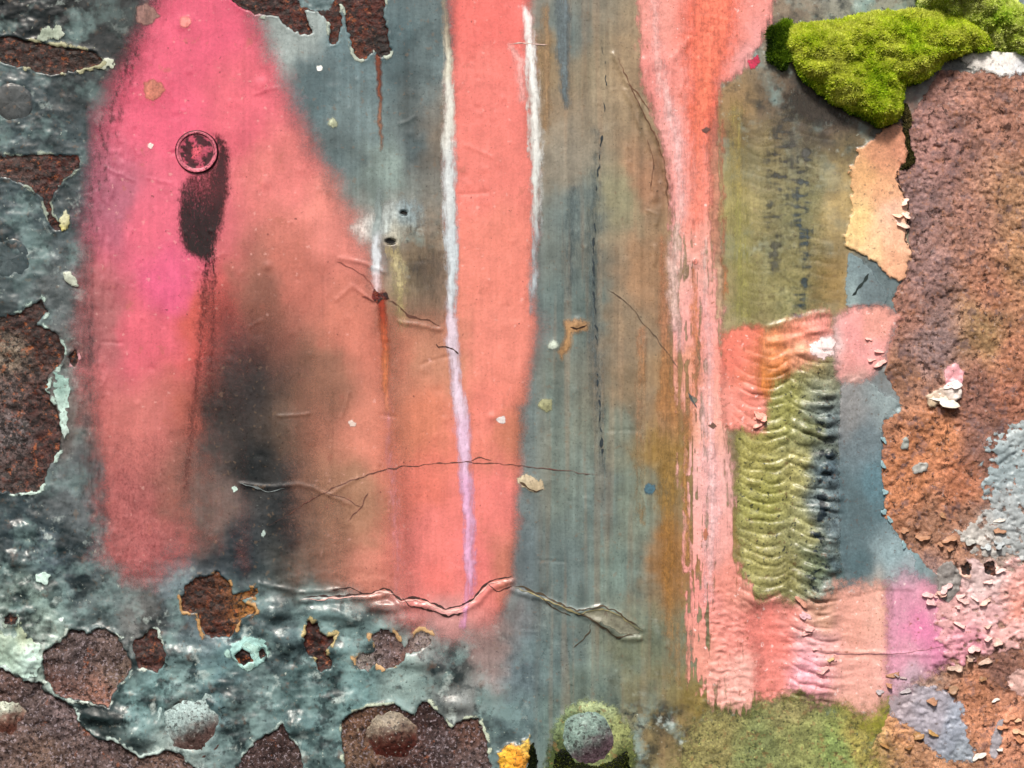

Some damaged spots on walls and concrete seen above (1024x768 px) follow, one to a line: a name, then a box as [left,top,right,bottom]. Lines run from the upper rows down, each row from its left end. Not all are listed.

peeling [37,25,65,41]
peeling [59,210,69,231]
corrosion [372,289,389,410]
peeling [53,371,71,439]
peeling [926,363,964,409]
crack [242,373,604,519]
peeling [934,420,1024,666]
peeling [35,572,50,585]
peeling [0,622,43,679]
peeling [230,635,268,669]
peeling [1007,668,1024,696]
peeling [876,672,975,763]